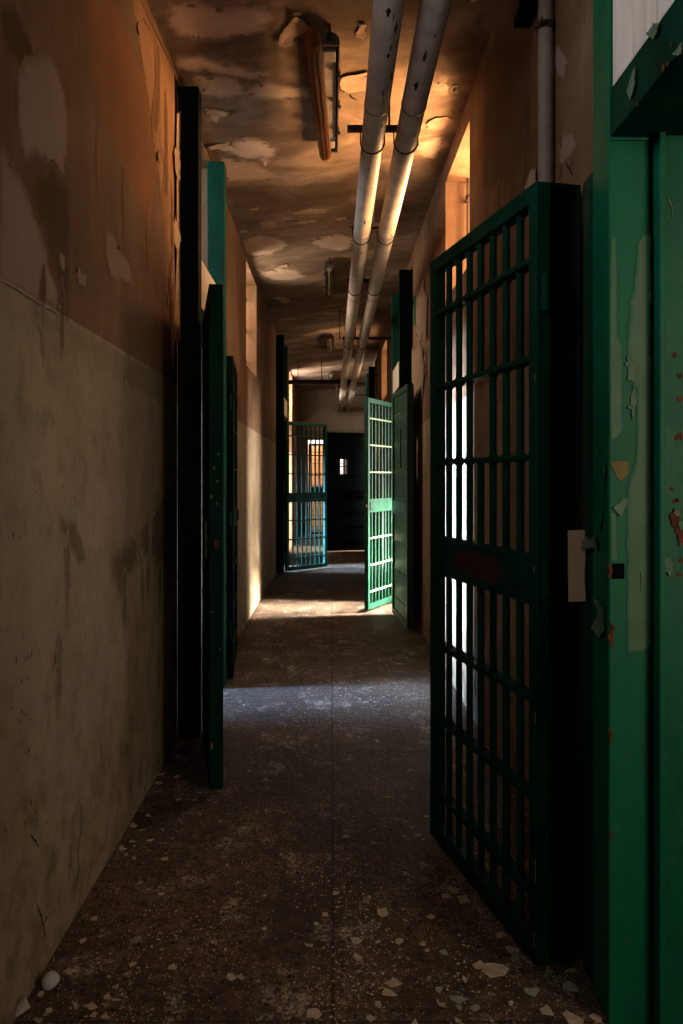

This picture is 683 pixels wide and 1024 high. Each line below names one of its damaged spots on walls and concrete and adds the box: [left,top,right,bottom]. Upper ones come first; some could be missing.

peeling [646,22,659,39]
flaking render [164,0,312,123]
peeling [626,67,636,100]
peeling [0,51,86,314]
flaking render [208,137,281,183]
peeling [105,226,133,286]
flaking render [240,222,308,281]
peeling [610,234,652,654]